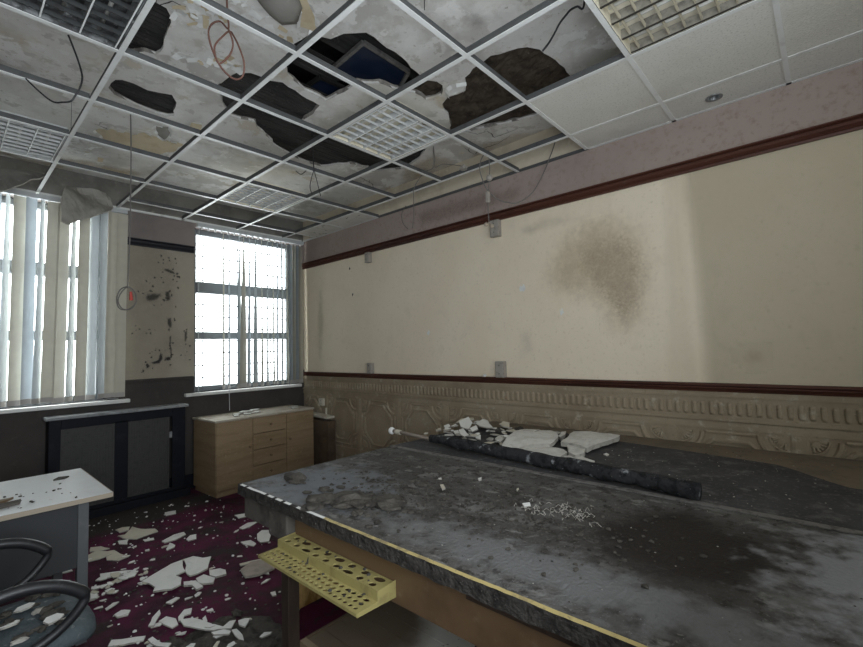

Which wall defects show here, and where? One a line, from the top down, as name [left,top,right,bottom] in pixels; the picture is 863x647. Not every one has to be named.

spalling [93,80,183,156]
spalling [128,0,570,170]